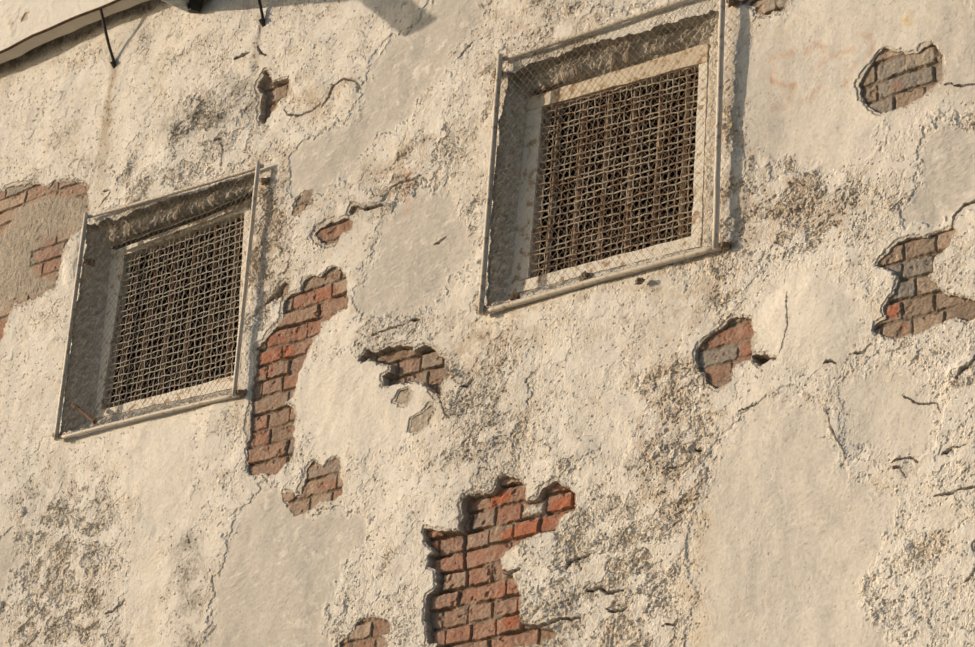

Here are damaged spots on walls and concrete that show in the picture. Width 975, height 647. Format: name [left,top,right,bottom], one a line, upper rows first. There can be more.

flaking render [257,69,290,125]
crack [951,199,975,227]
flaking render [0,180,90,340]
crack [779,292,788,353]
peeling [693,0,975,647]
crack [823,343,872,364]
peeling [200,177,481,647]
crack [825,408,847,459]
flaking render [422,475,577,647]